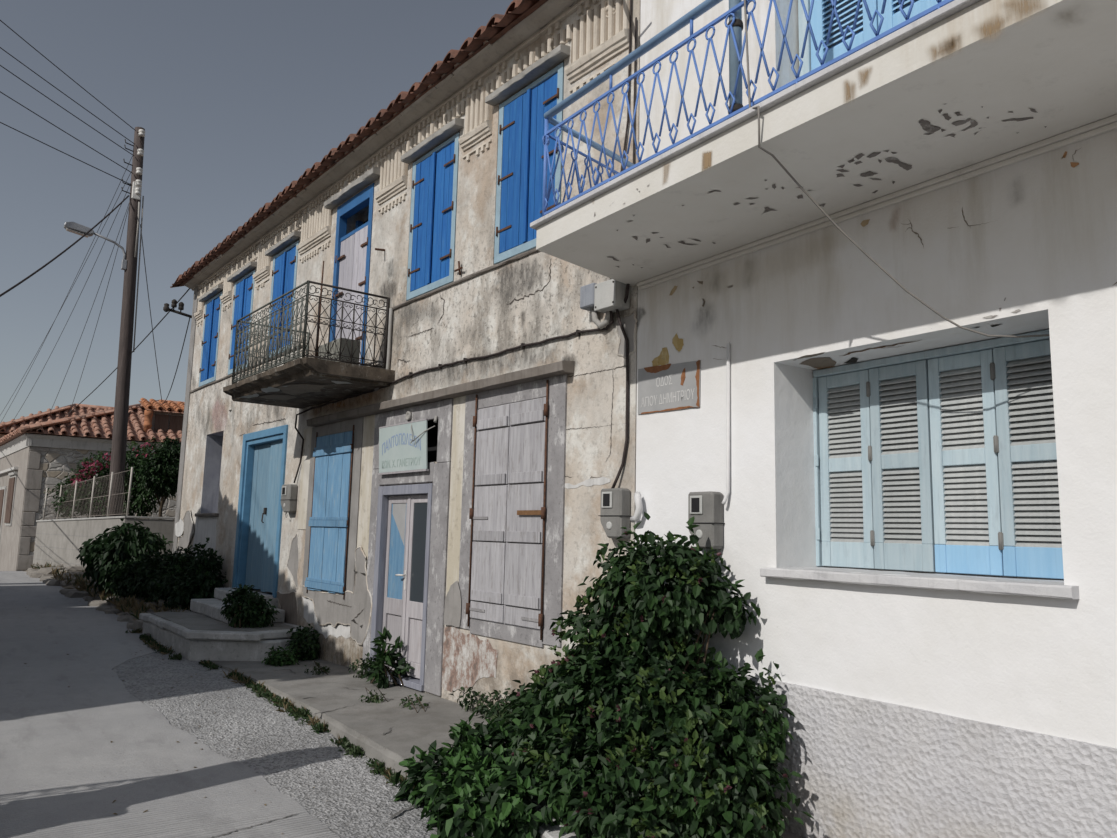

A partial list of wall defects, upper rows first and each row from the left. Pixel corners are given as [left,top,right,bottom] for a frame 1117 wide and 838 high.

peeling [919,104,989,137]
peeling [836,150,912,193]
peeling [734,180,814,215]
peeling [652,332,685,366]
flaking render [277,533,372,645]
flaking render [442,626,498,692]